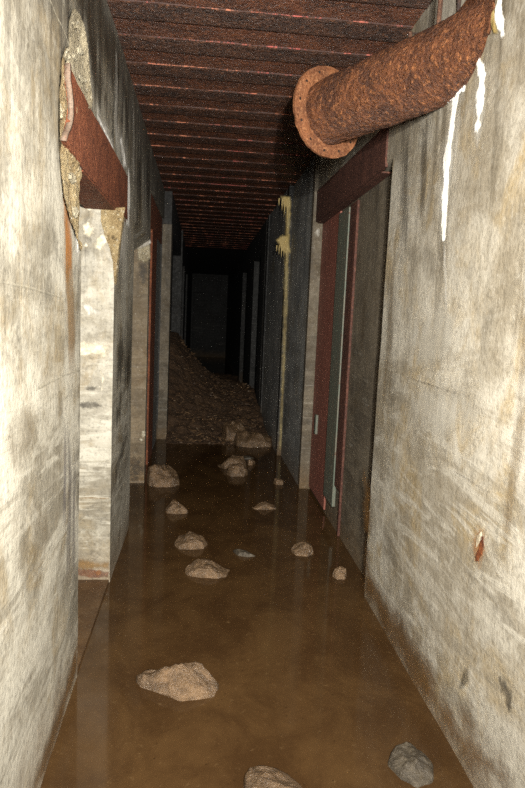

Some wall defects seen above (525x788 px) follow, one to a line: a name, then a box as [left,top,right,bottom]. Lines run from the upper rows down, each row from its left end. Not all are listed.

spalling [58,8,125,284]
water stain [441,85,465,241]
water stain [474,59,486,132]
water stain [491,0,504,37]